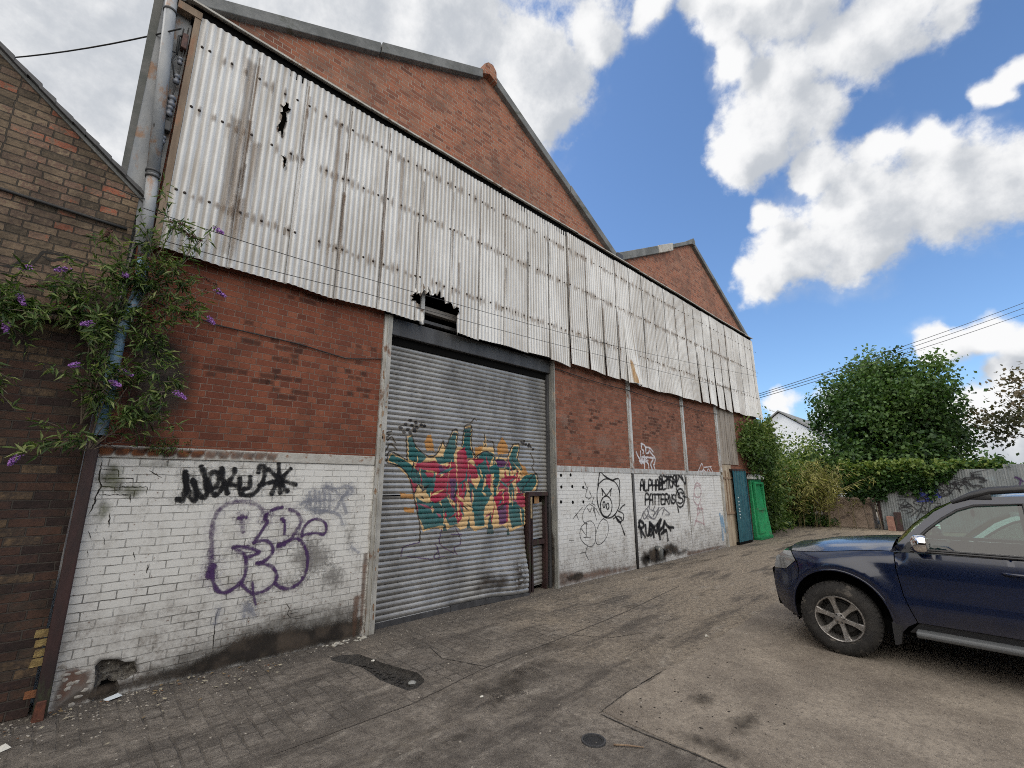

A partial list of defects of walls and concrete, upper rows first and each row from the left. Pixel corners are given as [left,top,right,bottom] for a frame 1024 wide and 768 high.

peeling [410,283,460,333]
damp [641,544,718,566]
spalling [53,658,137,711]
damp [70,614,361,702]